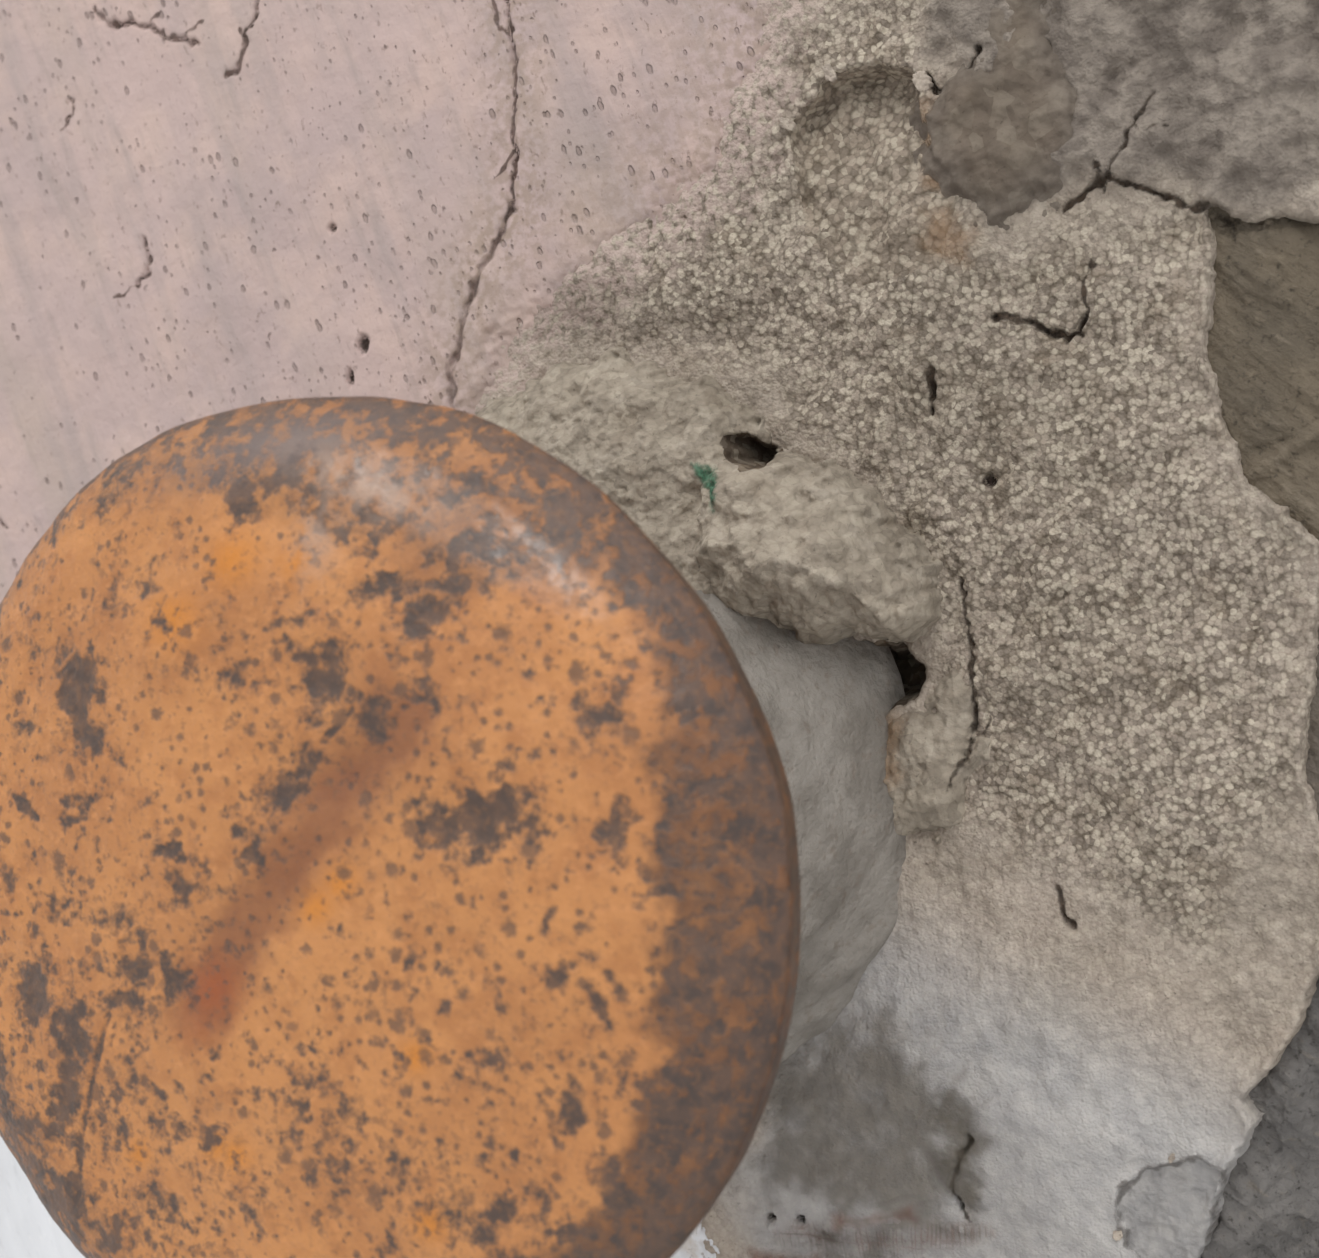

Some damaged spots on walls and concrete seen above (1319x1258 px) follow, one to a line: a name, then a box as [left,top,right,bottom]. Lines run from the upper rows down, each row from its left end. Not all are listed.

crack [98,12,204,47]
crack [224,13,259,79]
crack [447,0,520,398]
crack [993,260,1096,342]
spalling [1207,207,1319,540]
spalling [1306,628,1319,820]
spalling [1112,978,1319,1258]